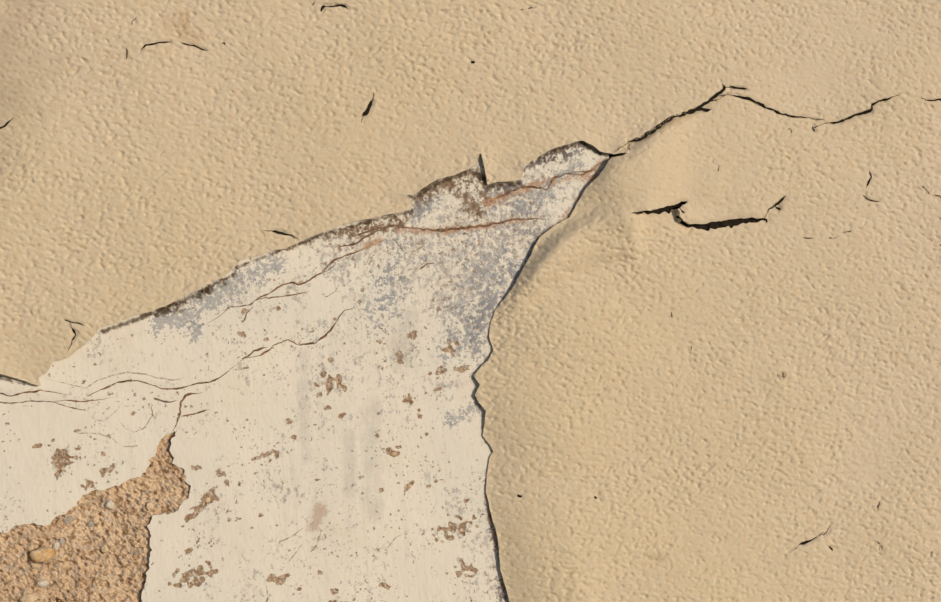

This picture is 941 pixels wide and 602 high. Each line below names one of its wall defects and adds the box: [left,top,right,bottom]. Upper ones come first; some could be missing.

crack [126,41,207,59]
crack [312,3,347,12]
peeling [0,141,609,602]
crack [0,84,898,447]